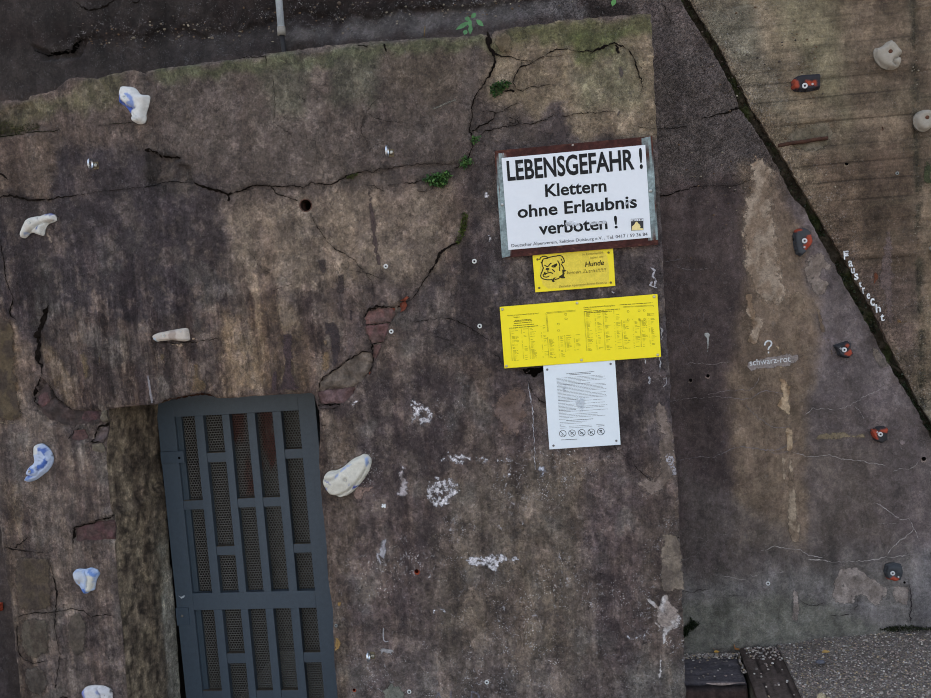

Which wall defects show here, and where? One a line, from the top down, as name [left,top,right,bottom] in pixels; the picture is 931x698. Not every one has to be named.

crack [0,32,643,201]
crack [0,242,16,320]
crack [33,305,109,443]
spalling [38,383,110,452]
crack [163,393,214,402]
spalling [318,296,409,409]
crack [312,217,500,426]
damp [411,400,433,423]
efflorescence [427,477,460,506]
efflorescence [461,554,517,572]
efflorescence [646,595,680,644]